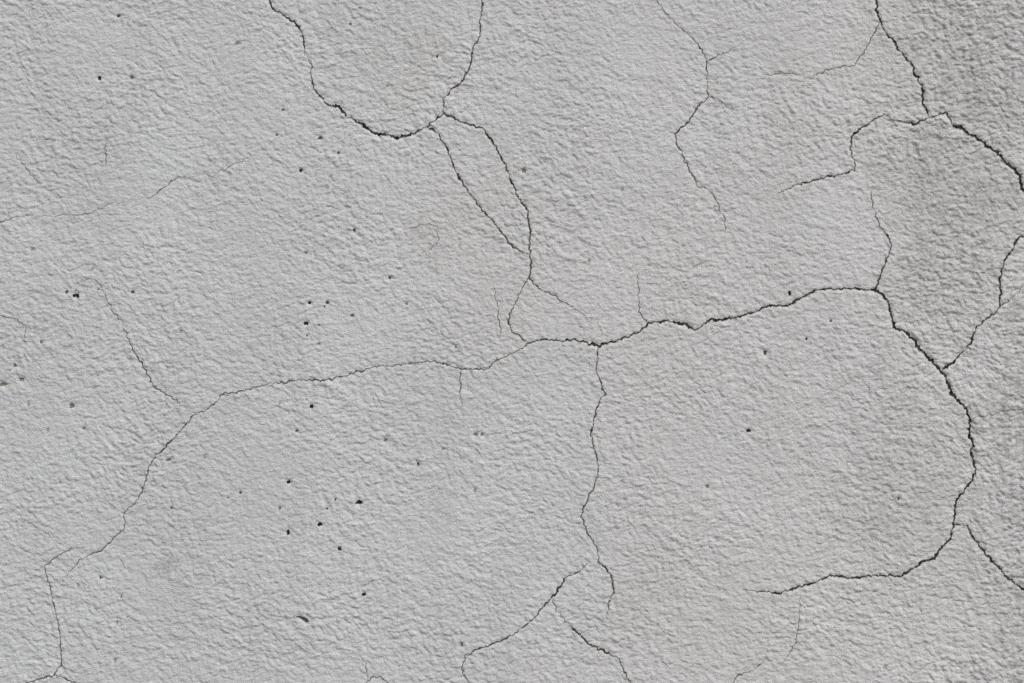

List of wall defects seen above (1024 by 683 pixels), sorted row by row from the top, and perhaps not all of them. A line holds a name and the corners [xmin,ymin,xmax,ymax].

crack [85,0,1024,594]
crack [15,512,76,683]
crack [461,557,631,683]